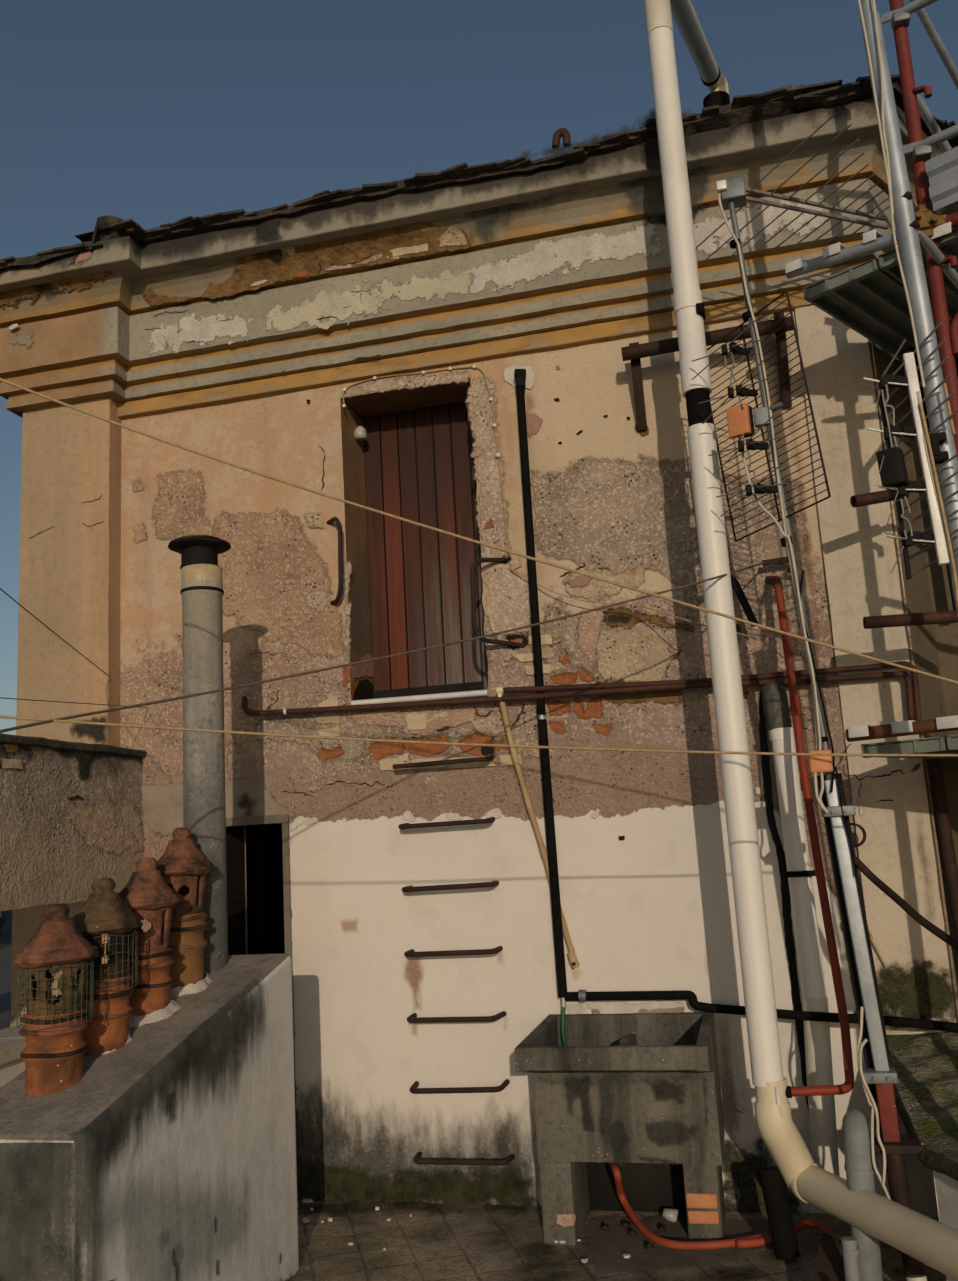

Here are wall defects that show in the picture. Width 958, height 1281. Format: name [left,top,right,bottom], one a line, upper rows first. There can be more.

peeling [148,222,662,354]
flaking render [131,370,706,764]
flaking render [720,474,810,635]
peeling [289,816,318,860]
peeling [401,811,415,822]
peeling [446,812,463,821]
peeling [485,808,502,818]
rust [407,960,420,992]
damp [0,1000,255,1281]
damp [296,1095,538,1207]
damp [538,1046,736,1165]